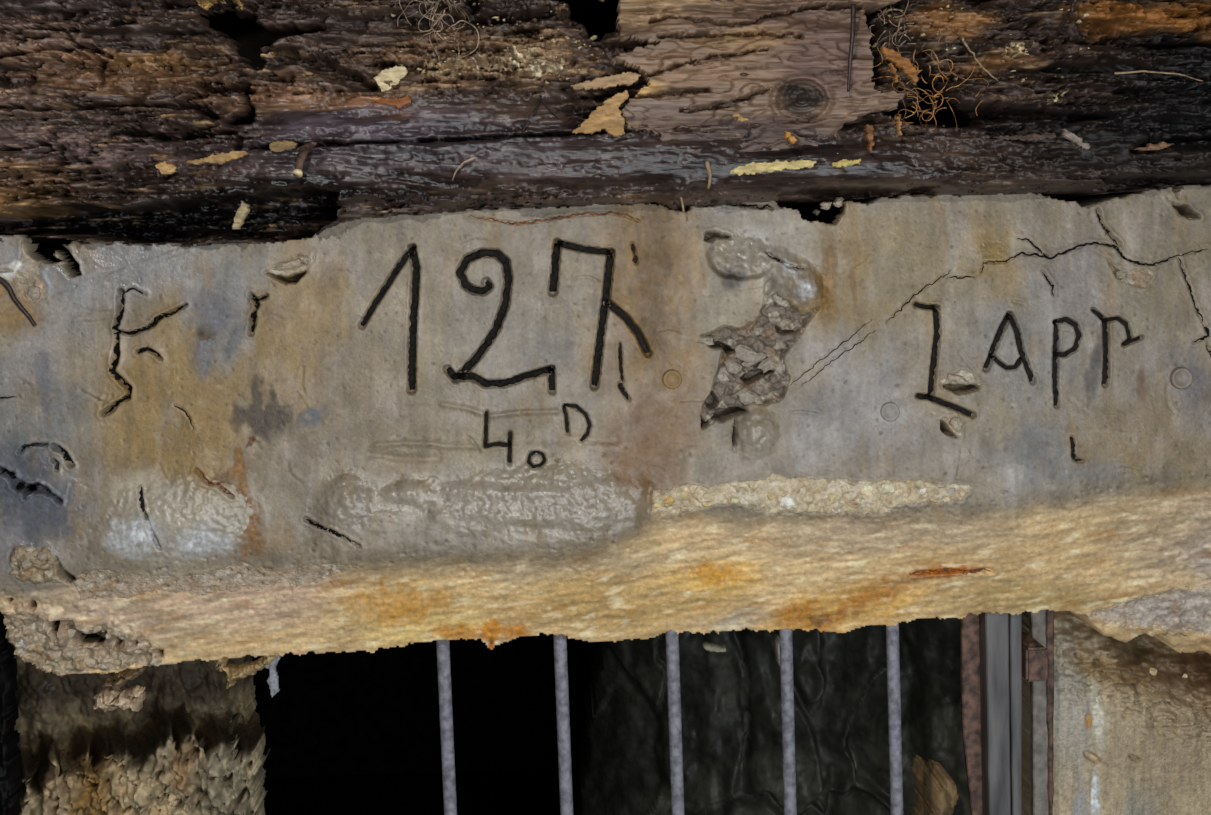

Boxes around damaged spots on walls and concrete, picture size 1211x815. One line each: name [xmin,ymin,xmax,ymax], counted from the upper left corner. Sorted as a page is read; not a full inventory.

crack [787,210,1211,387]
spalling [697,294,820,430]
rust [910,566,967,578]
rust [779,588,894,631]
spalling [1080,585,1211,636]
spalling [0,611,164,676]